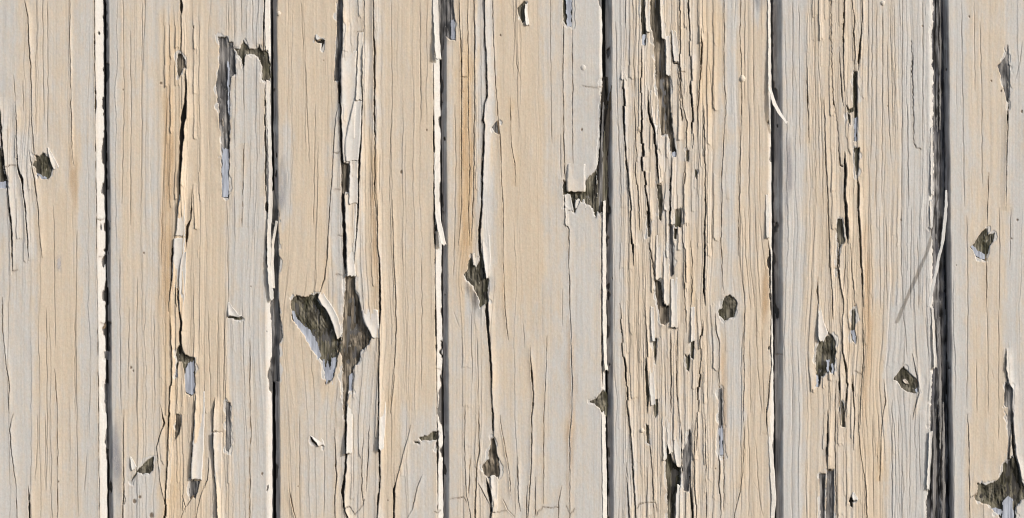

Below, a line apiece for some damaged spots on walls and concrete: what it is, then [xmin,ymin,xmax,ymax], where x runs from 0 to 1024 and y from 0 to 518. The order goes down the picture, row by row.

peeling [998,46,1010,102]
crack [156,82,223,518]
peeling [216,0,283,382]
peeling [318,292,341,339]
peeling [362,309,380,339]
crack [321,0,572,518]
peeling [472,235,491,278]
peeling [562,76,609,371]
peeling [641,0,697,518]
peeling [970,229,994,261]
peeling [166,345,205,500]
peeling [482,438,500,478]